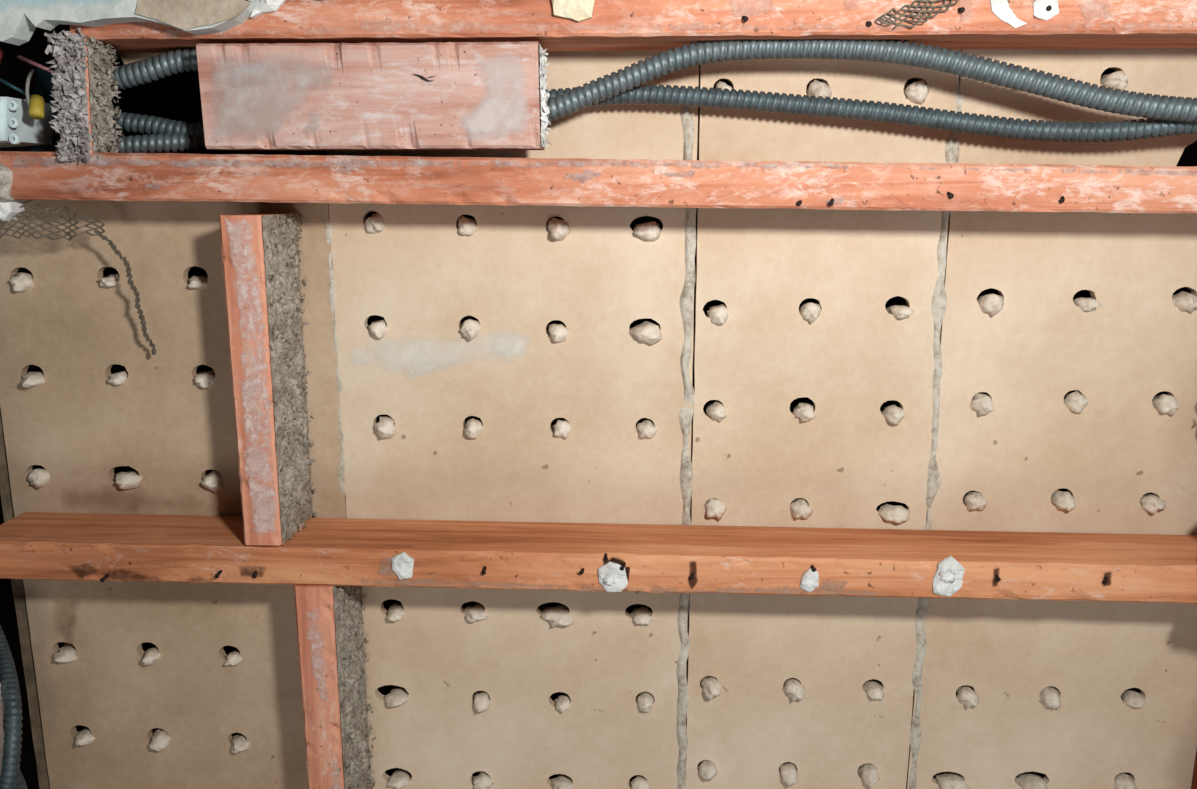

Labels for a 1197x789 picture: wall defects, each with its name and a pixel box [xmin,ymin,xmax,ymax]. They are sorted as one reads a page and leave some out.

spalling [250,0,286,19]
spalling [990,0,1059,28]
peeling [0,27,155,221]
peeling [266,159,451,172]